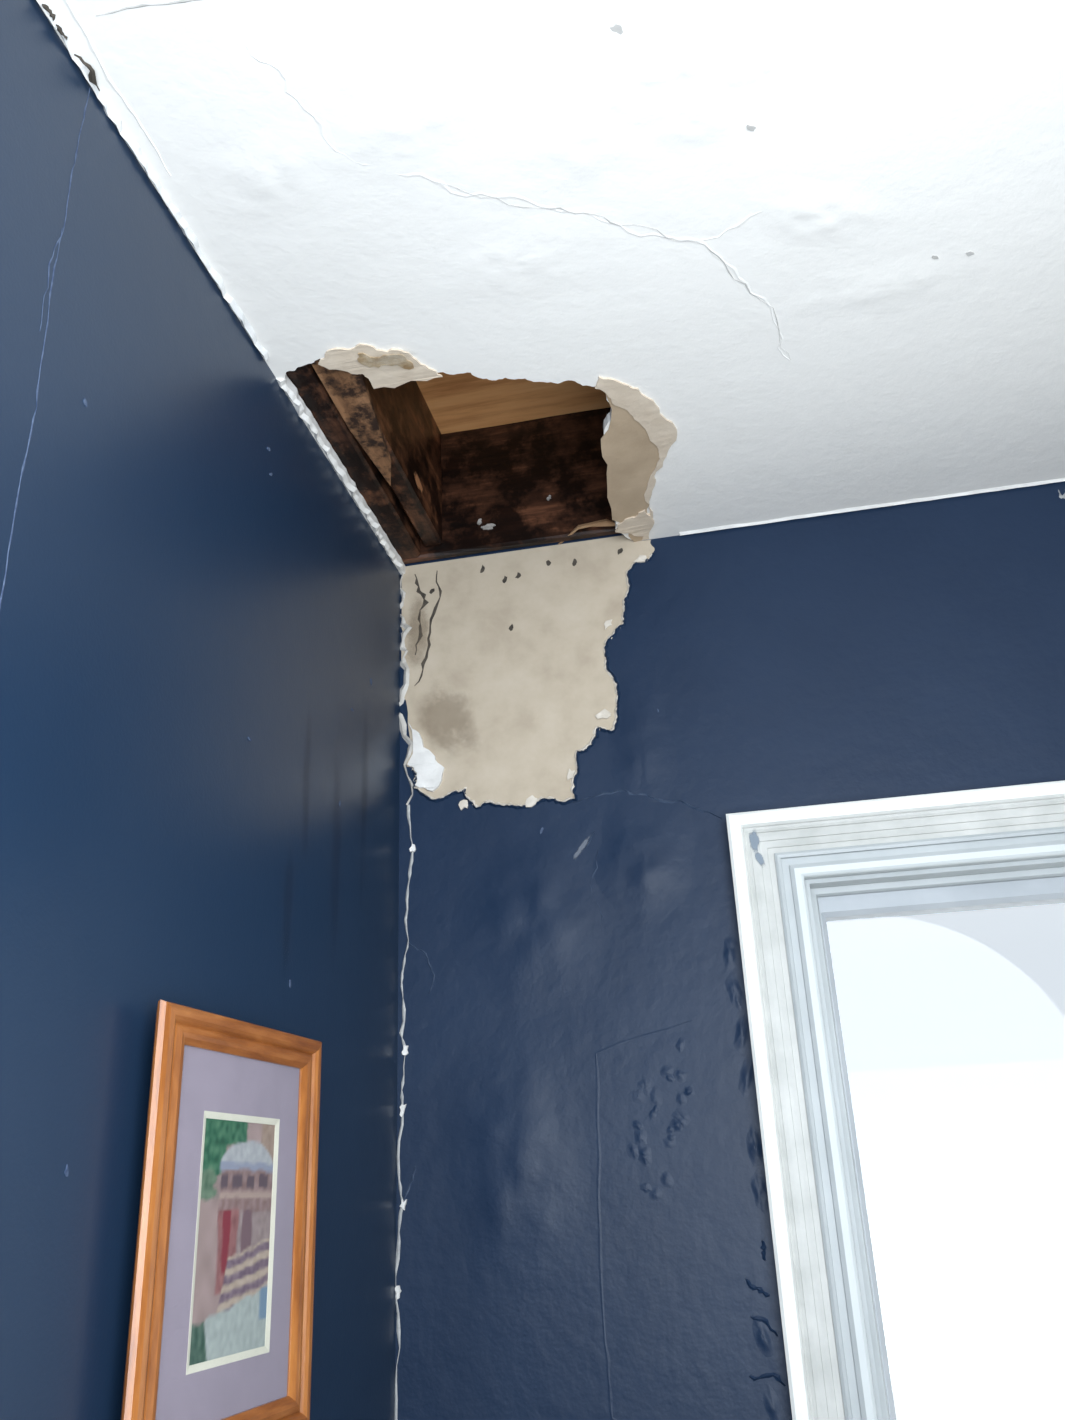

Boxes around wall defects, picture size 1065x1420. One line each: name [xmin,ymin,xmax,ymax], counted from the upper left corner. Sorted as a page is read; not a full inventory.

crack [0,0,442,685]
peeling [399,535,656,811]
crack [395,805,435,1420]